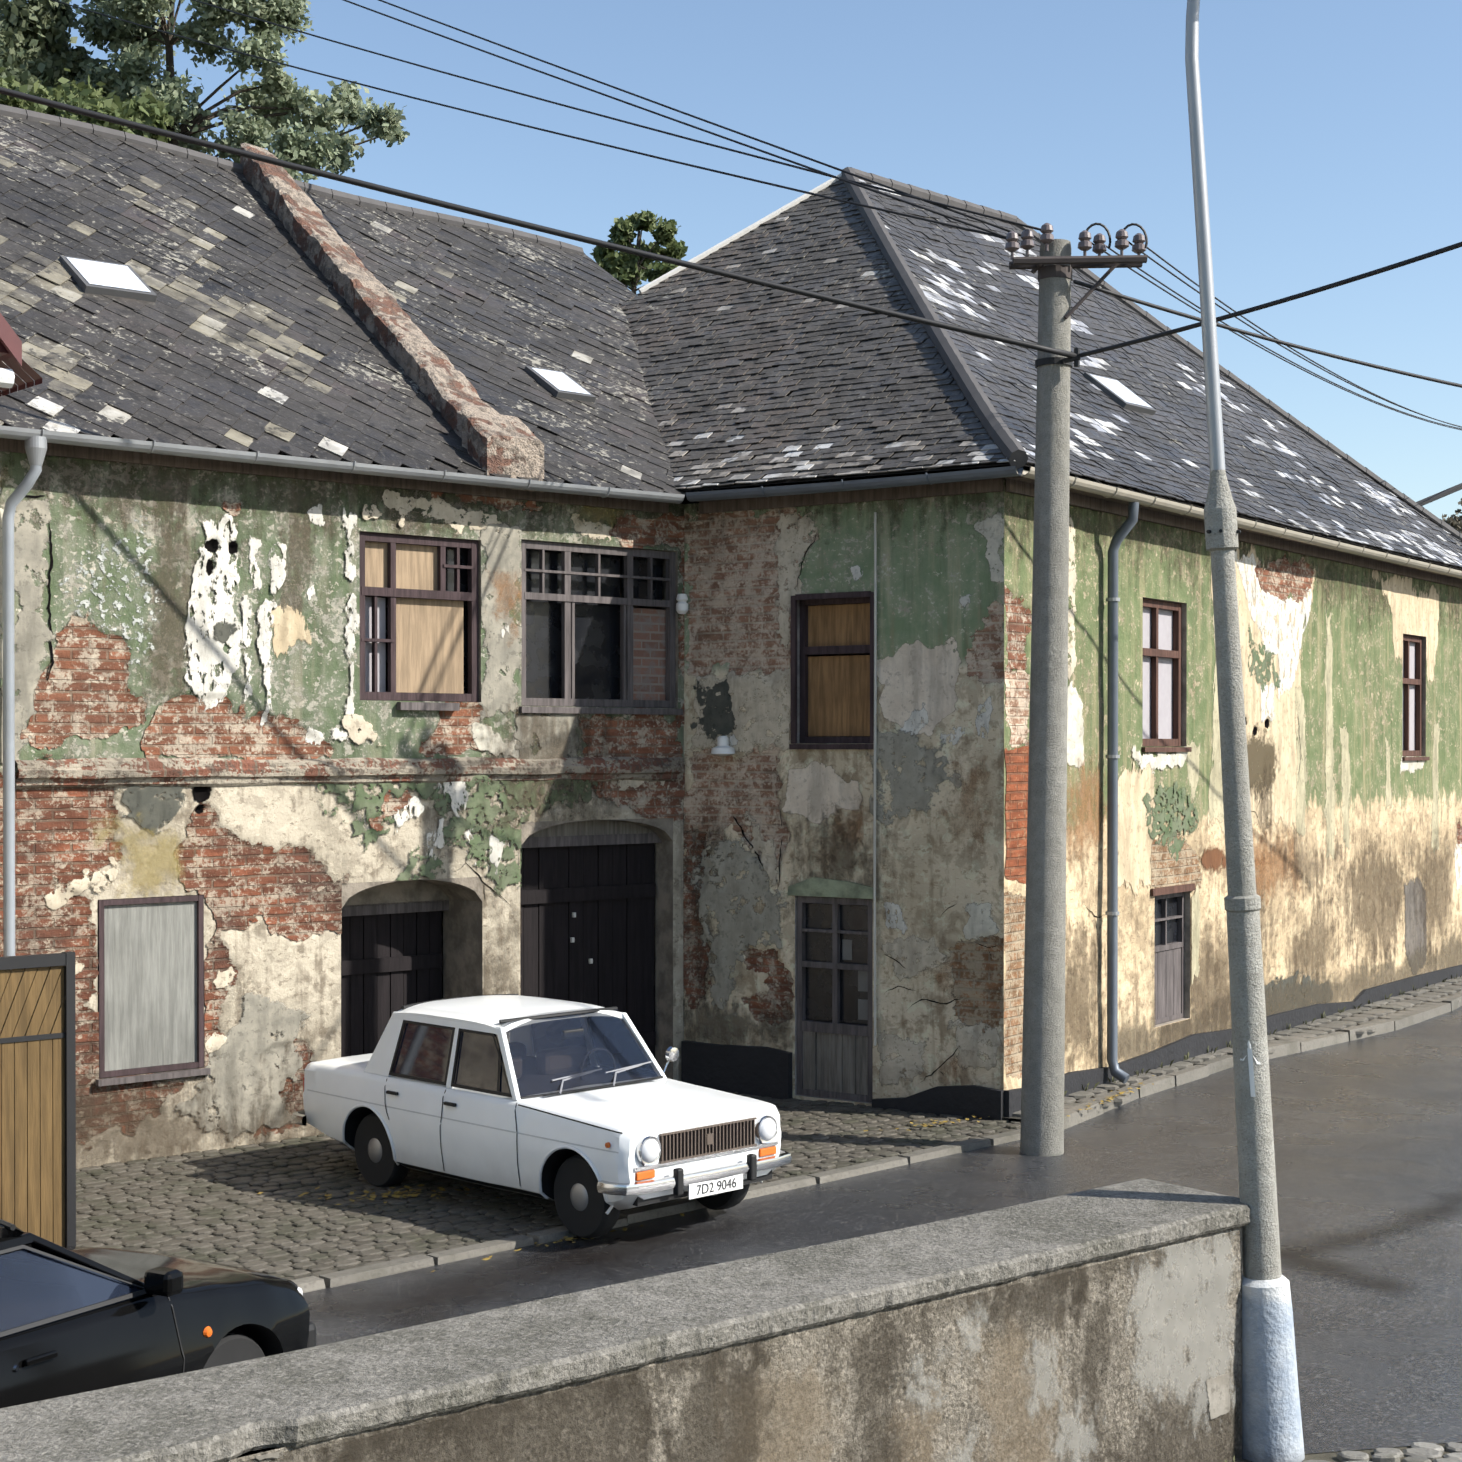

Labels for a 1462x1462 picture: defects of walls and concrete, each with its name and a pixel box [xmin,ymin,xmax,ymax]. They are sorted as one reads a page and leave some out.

spalling [0,475,1032,1151]
leakage [1247,730,1277,799]
peeling [1235,544,1351,859]
peeling [1385,719,1462,890]
leakage [1118,997,1232,1061]
leakage [1265,934,1462,1016]